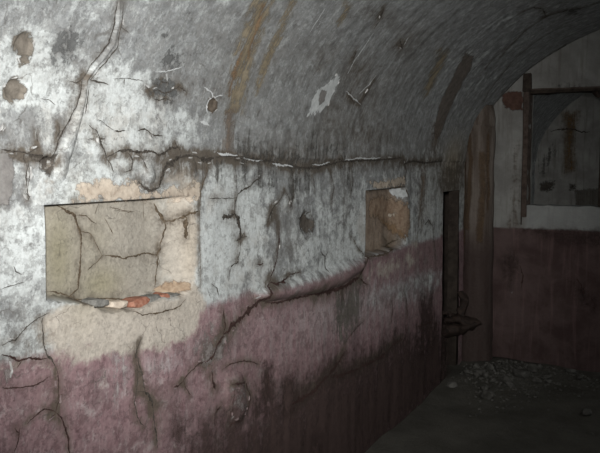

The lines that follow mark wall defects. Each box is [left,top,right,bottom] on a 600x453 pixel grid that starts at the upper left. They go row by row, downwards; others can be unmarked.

spalling [2,76,28,103]
spalling [11,31,35,68]
leakage [162,45,179,69]
spalling [207,96,218,113]
rust [222,0,295,151]
peeling [307,73,341,117]
spalling [71,178,201,204]
crack [2,2,441,405]
spalling [367,175,408,199]
crack [1,313,70,453]
crack [134,338,158,448]
leakage [185,295,449,453]